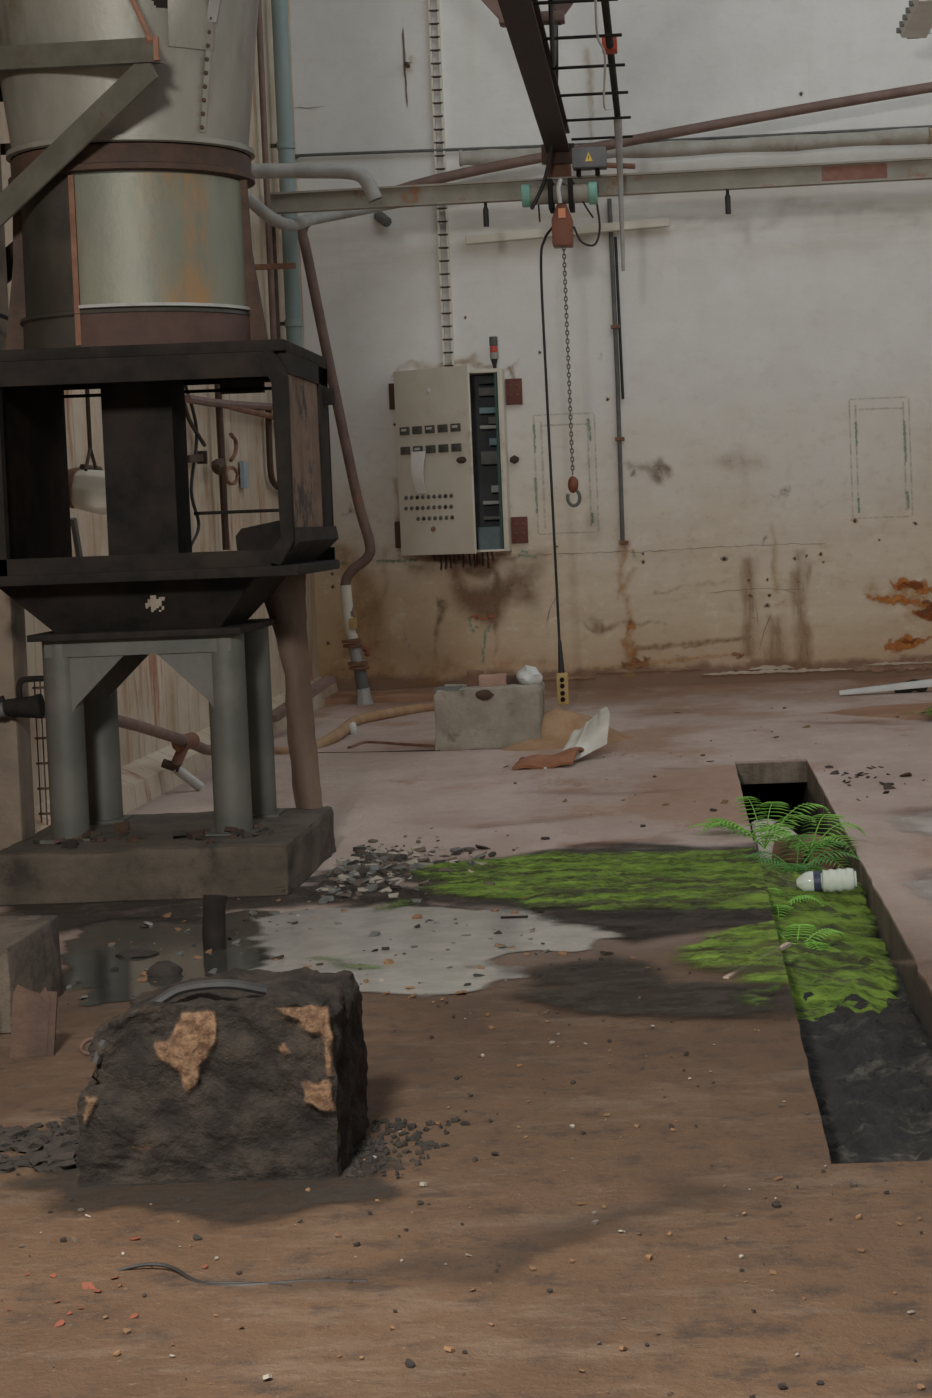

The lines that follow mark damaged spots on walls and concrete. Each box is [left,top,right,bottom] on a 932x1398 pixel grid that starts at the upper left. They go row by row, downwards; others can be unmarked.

water stain [433,554,500,626]
corrosion [867,578,932,651]
water stain [0,898,203,931]
water stain [225,842,773,940]
water stain [519,958,795,1017]